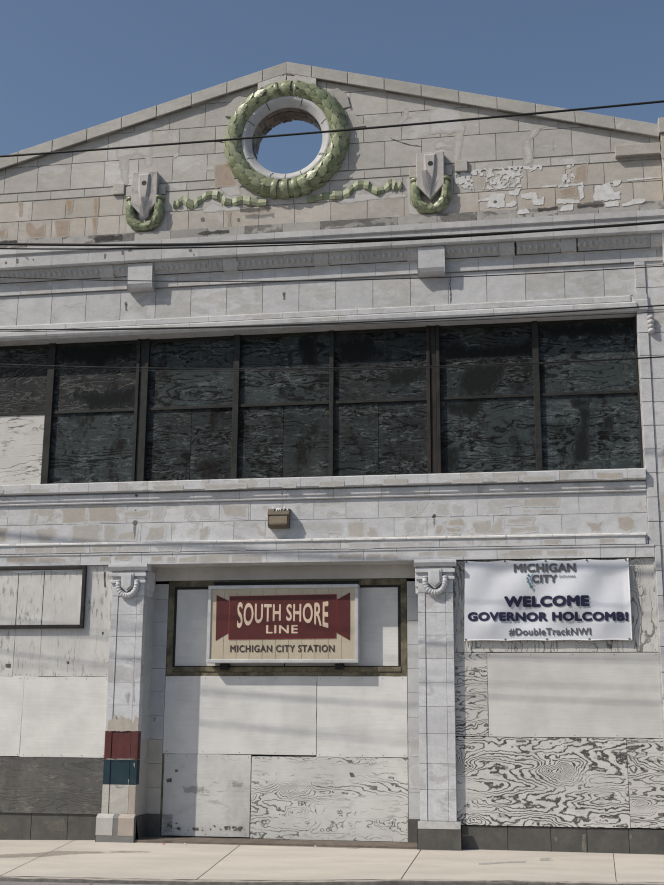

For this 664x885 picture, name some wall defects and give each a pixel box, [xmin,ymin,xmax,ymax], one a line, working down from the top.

peeling [477,168,530,214]
peeling [542,164,584,211]